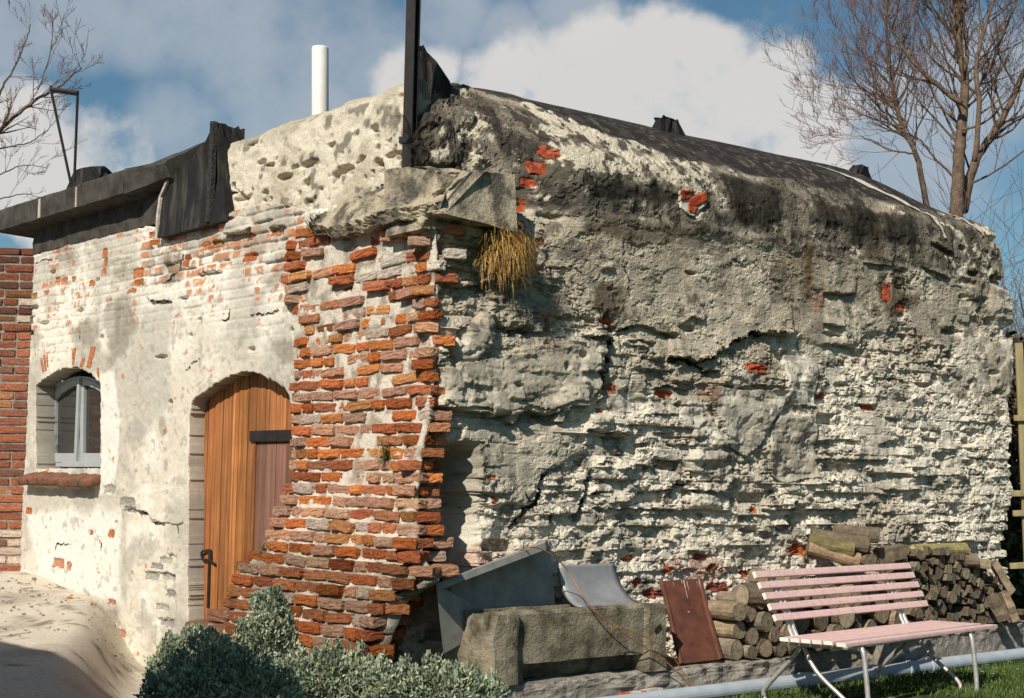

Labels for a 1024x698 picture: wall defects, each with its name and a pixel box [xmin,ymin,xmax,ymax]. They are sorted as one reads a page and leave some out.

spalling [516,144,567,247]
water stain [590,171,675,204]
spalling [677,189,708,216]
water stain [723,175,781,231]
spalling [32,252,76,299]
spalling [126,267,147,293]
spalling [182,215,259,270]
water stain [816,195,918,315]
crack [668,329,788,373]
flaking render [444,344,623,424]
crack [508,469,548,528]
spalling [143,556,177,627]